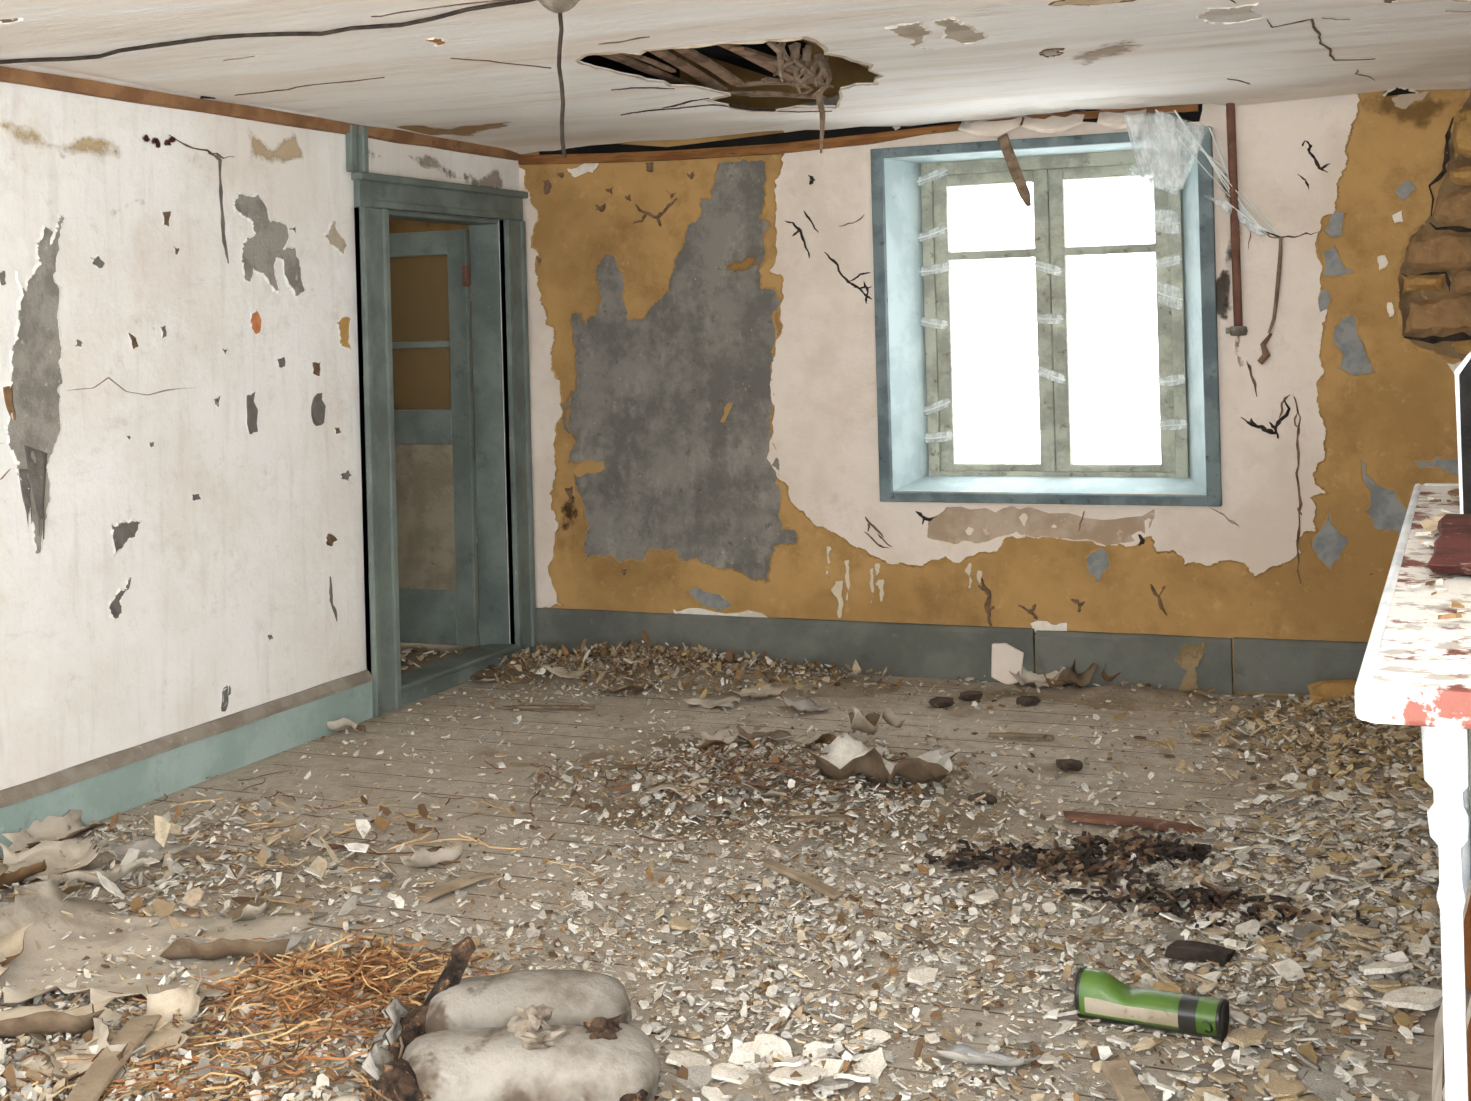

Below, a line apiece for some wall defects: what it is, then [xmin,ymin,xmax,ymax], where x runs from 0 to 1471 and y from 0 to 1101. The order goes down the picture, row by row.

leakage [70,139,116,153]
peeling [233,191,306,299]
crack [200,56,385,99]
crack [539,87,962,304]
crack [1068,109,1100,123]
crack [1142,104,1203,124]
crack [1267,17,1375,81]
peeling [0,214,83,556]
peeling [519,93,1376,608]
spalling [1377,87,1471,514]
crack [1241,361,1303,583]
peeling [673,583,768,618]